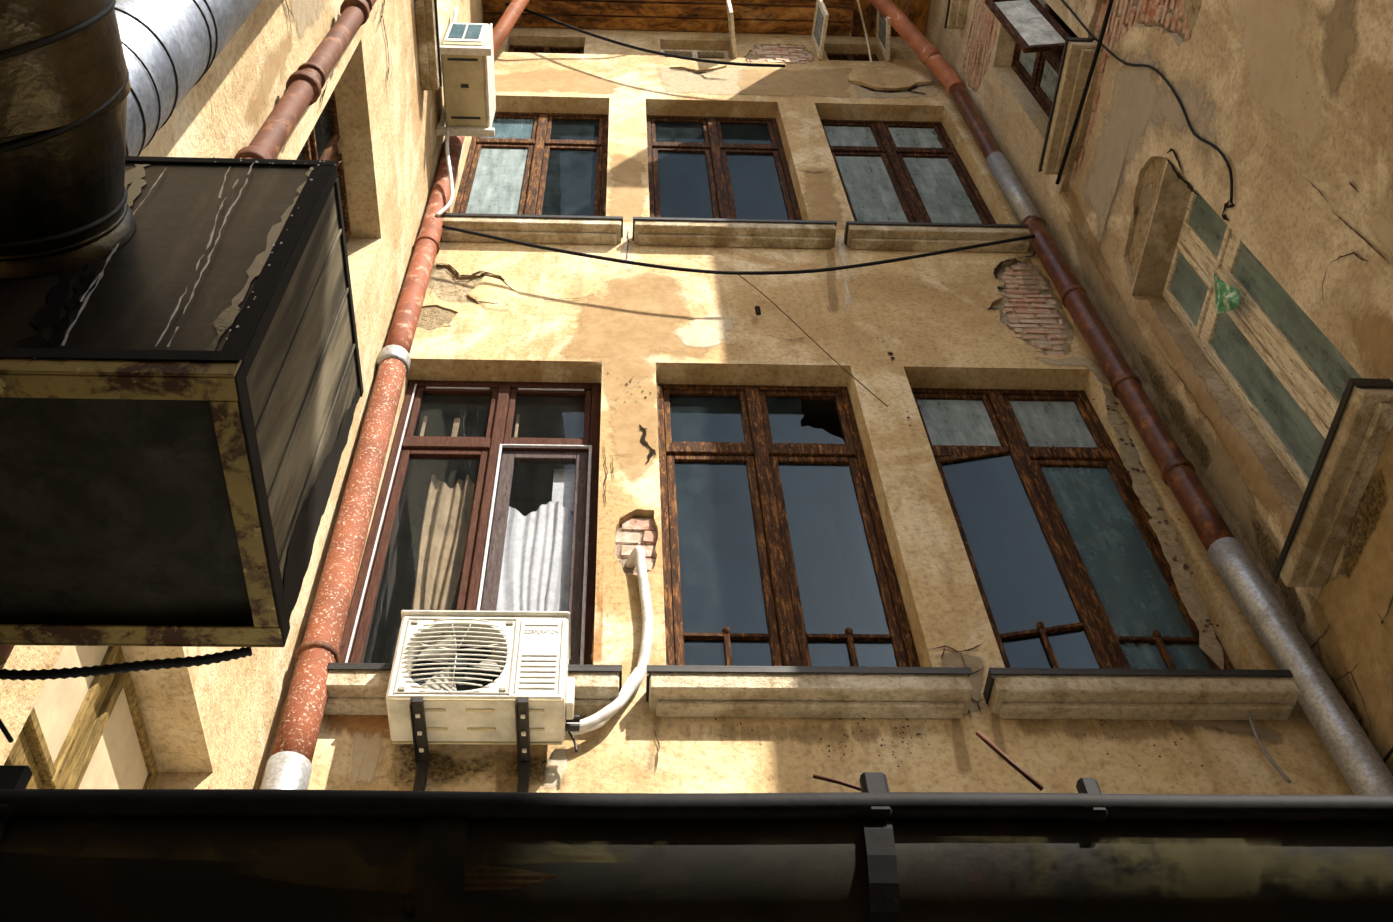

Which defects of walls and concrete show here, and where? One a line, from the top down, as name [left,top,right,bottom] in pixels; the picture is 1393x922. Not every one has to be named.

flaking render [964,0,999,93]
flaking render [1067,0,1202,192]
flaking render [417,262,501,331]
water stain [564,154,732,479]
flaking render [990,256,1076,355]
crack [604,424,656,503]
spalling [615,516,658,575]
flaking render [1093,381,1224,669]